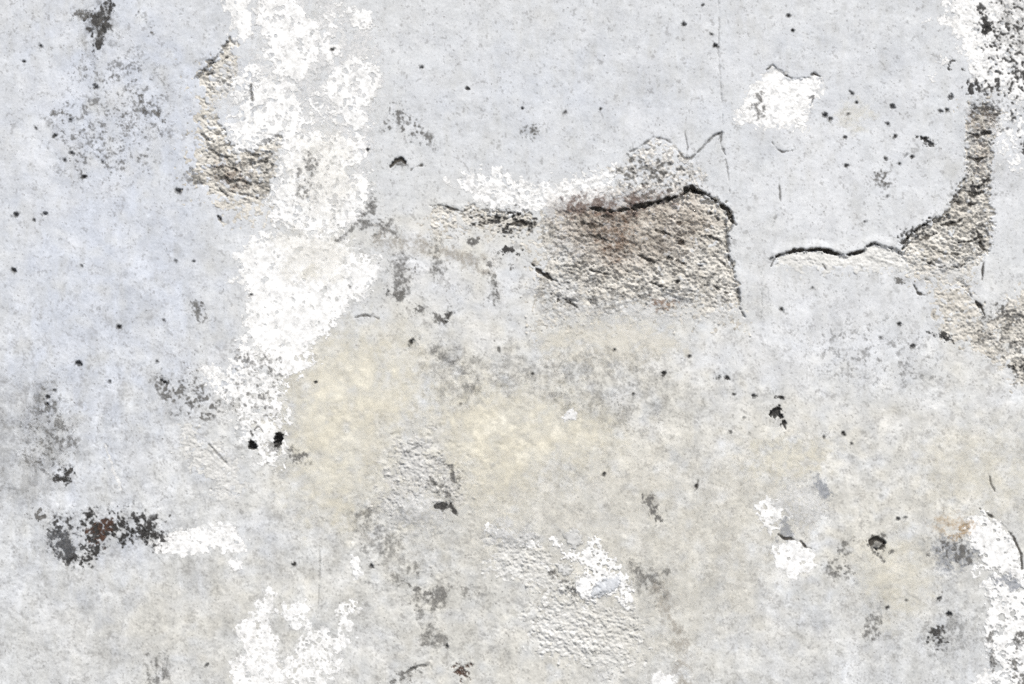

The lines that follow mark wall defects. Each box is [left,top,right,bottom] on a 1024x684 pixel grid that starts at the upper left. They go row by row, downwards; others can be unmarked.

peeling [170,0,384,502]
flaking render [416,135,760,342]
peeling [731,64,832,133]
crack [771,243,925,295]
flaking render [897,0,1024,394]